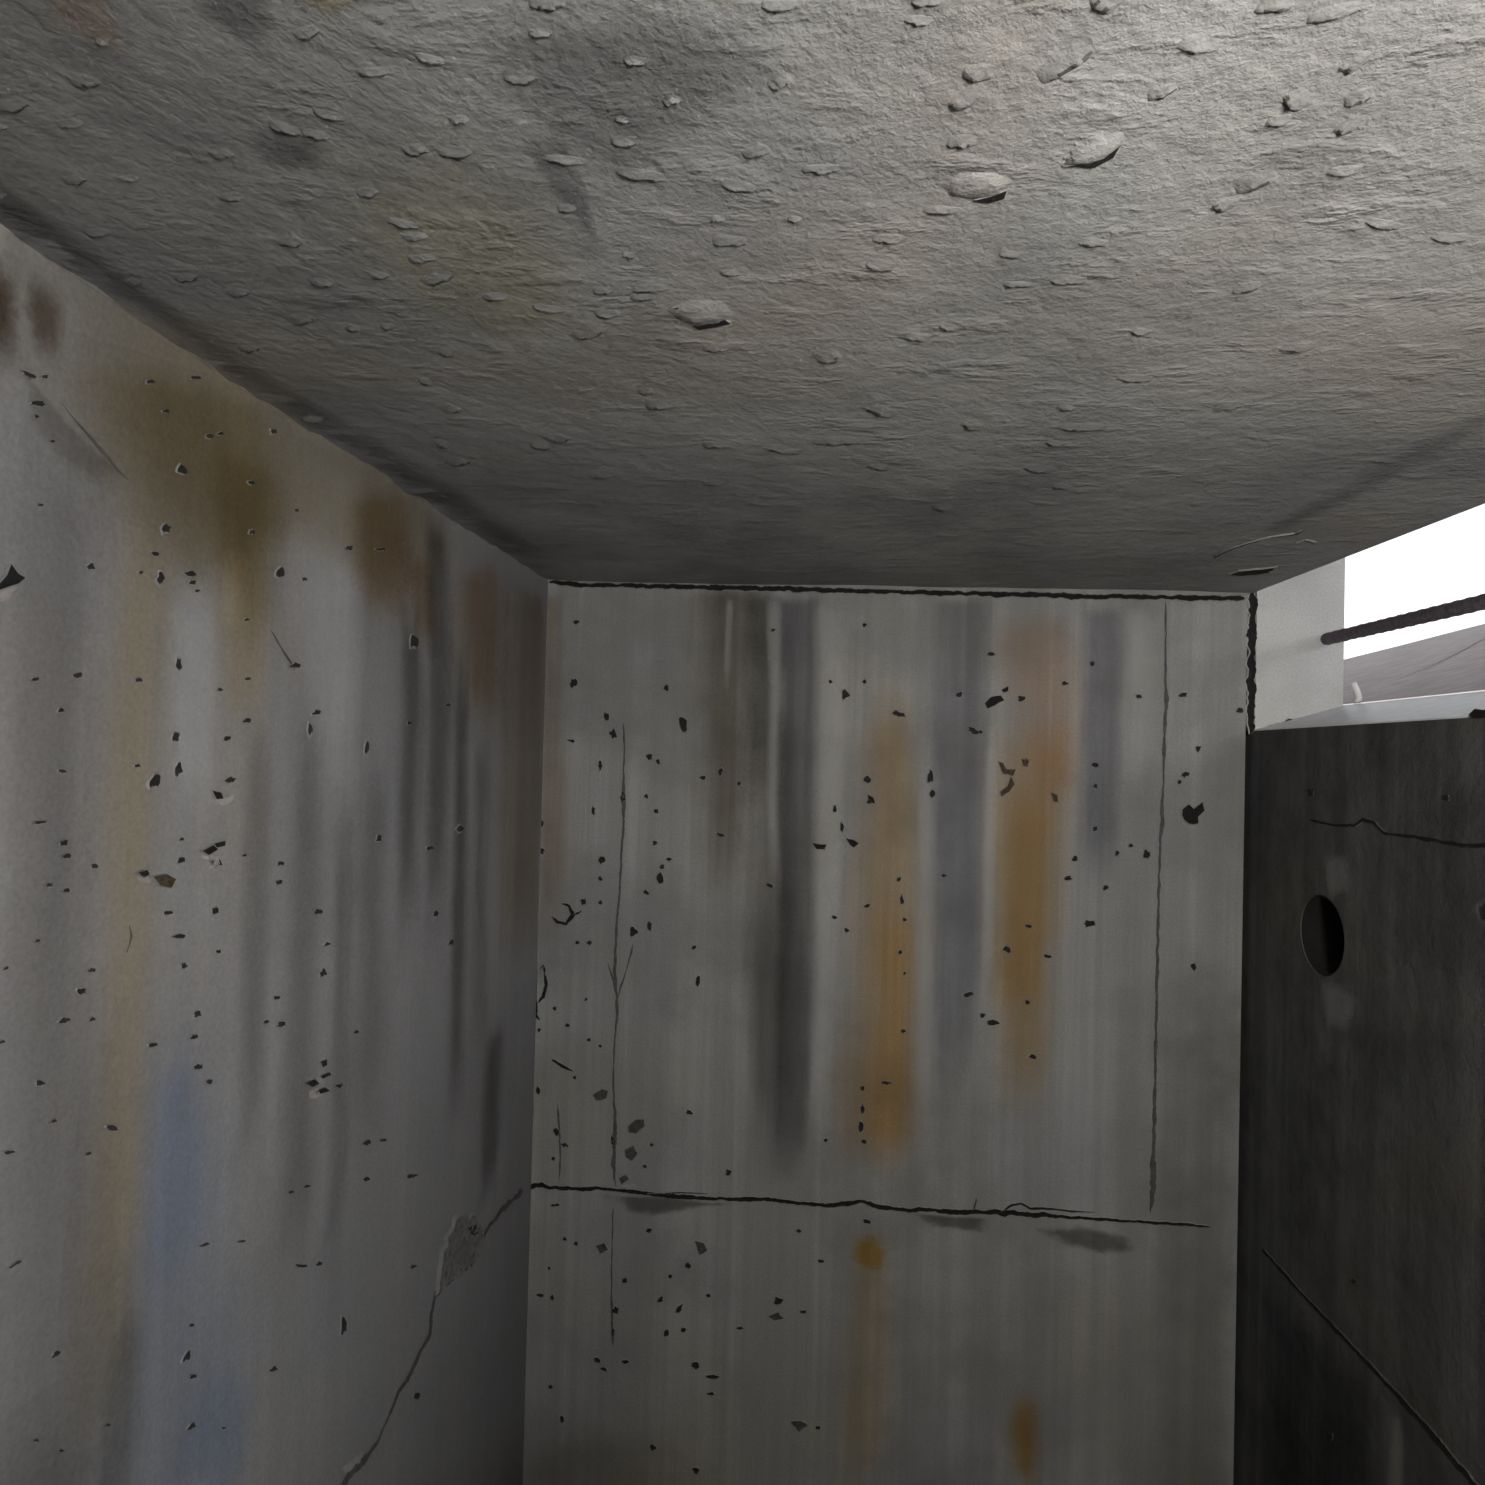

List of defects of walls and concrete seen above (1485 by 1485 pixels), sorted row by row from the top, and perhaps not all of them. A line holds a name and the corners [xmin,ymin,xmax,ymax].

crack [1213,529,1317,559]
crack [270,630,294,669]
crack [1310,817,1485,849]
crack [340,580,1292,1485]
crack [1262,1247,1479,1485]